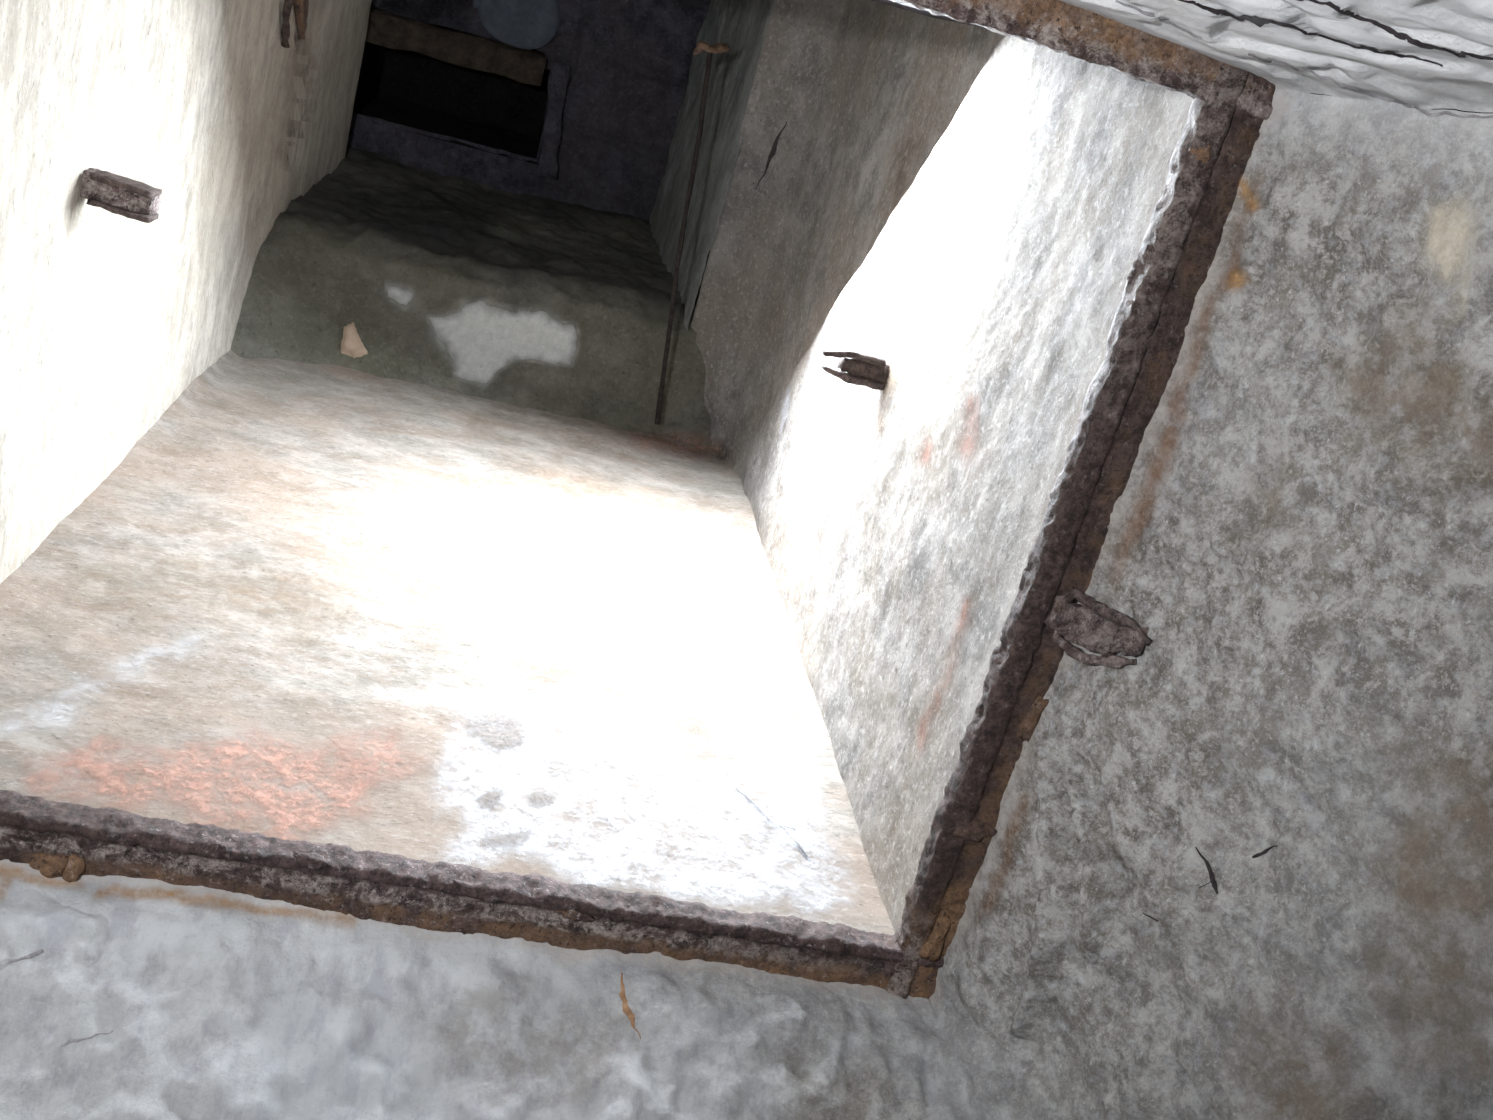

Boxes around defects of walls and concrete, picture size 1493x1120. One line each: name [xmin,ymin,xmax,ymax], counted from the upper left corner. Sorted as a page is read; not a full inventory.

crack [1115,0,1493,118]
corrosion [1017,696,1049,742]
corrosion [1,852,85,883]
corrosion [452,879,493,903]
crack [0,949,44,970]